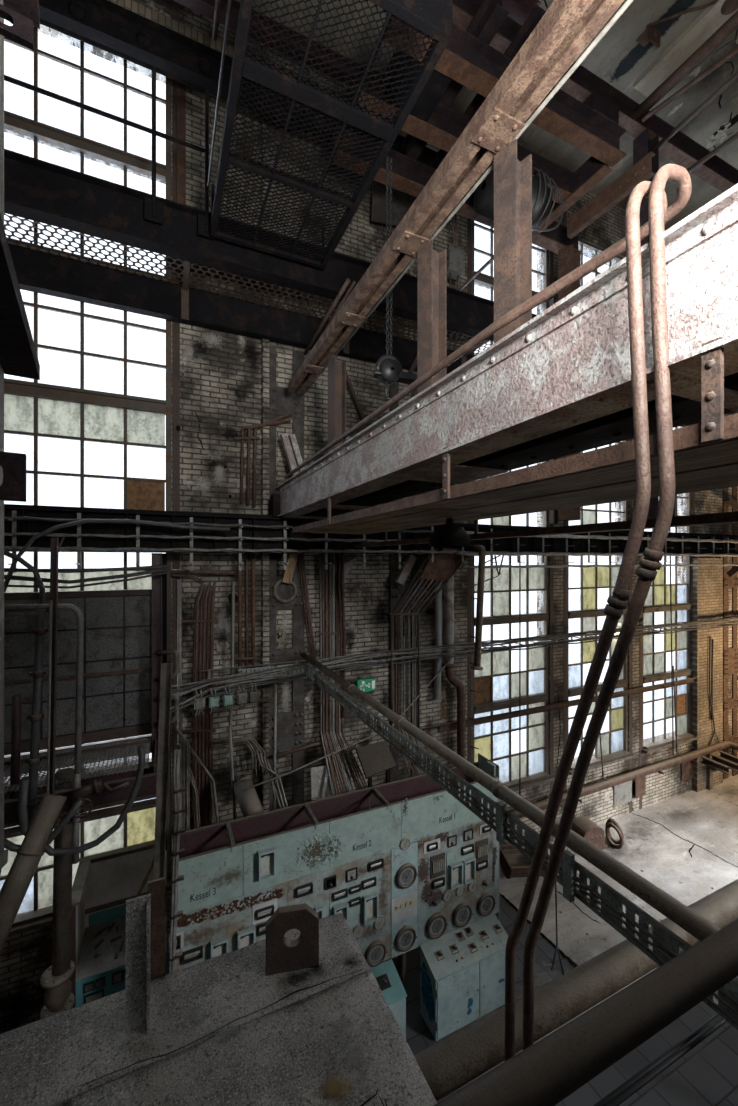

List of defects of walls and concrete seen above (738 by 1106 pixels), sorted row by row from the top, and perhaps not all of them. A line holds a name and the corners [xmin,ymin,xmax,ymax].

spalling [705,114,738,149]
crack [360,1089,387,1106]